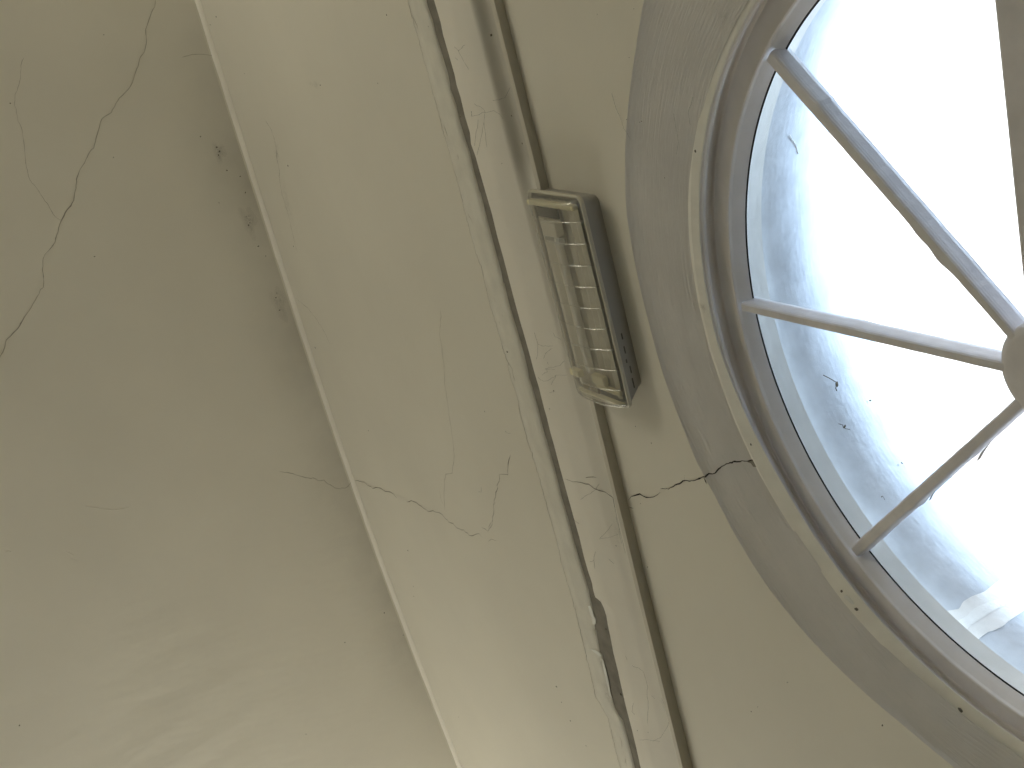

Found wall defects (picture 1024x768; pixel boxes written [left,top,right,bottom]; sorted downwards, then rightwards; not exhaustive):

crack [0,7,155,357]
crack [280,6,622,758]
crack [566,460,752,511]